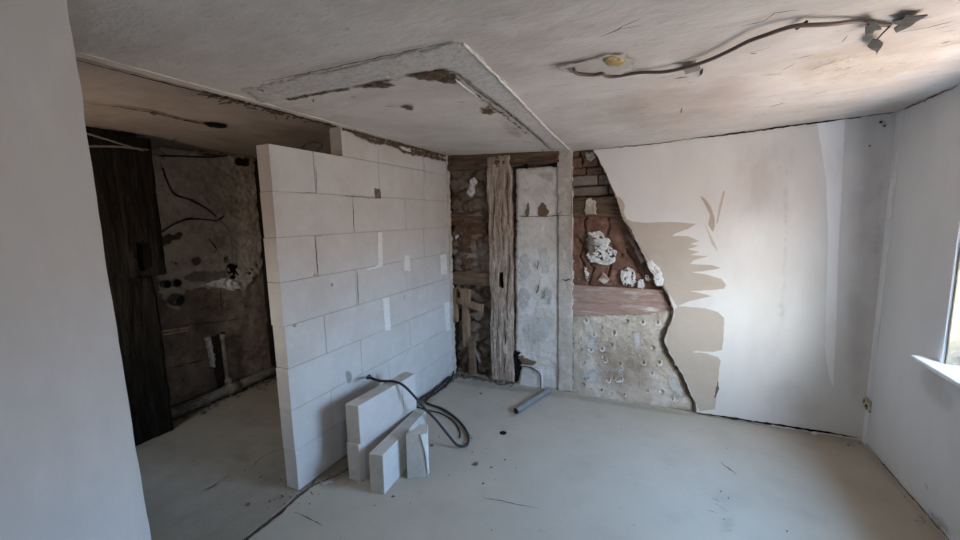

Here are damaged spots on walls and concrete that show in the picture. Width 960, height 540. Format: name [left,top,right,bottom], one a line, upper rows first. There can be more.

peeling [595,153,724,413]